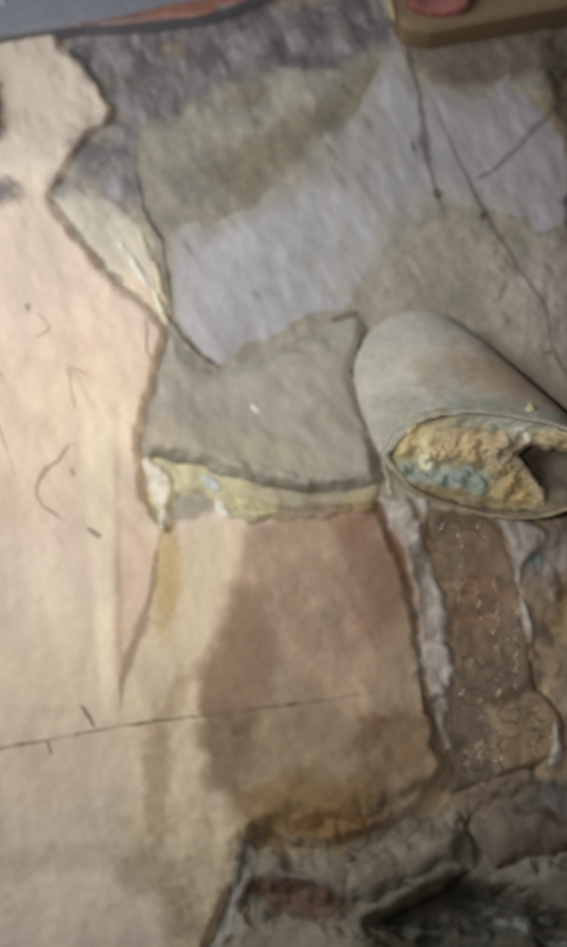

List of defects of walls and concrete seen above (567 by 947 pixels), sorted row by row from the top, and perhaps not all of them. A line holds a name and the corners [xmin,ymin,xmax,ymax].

peeling [50,175,171,325]
leakage [201,507,420,835]